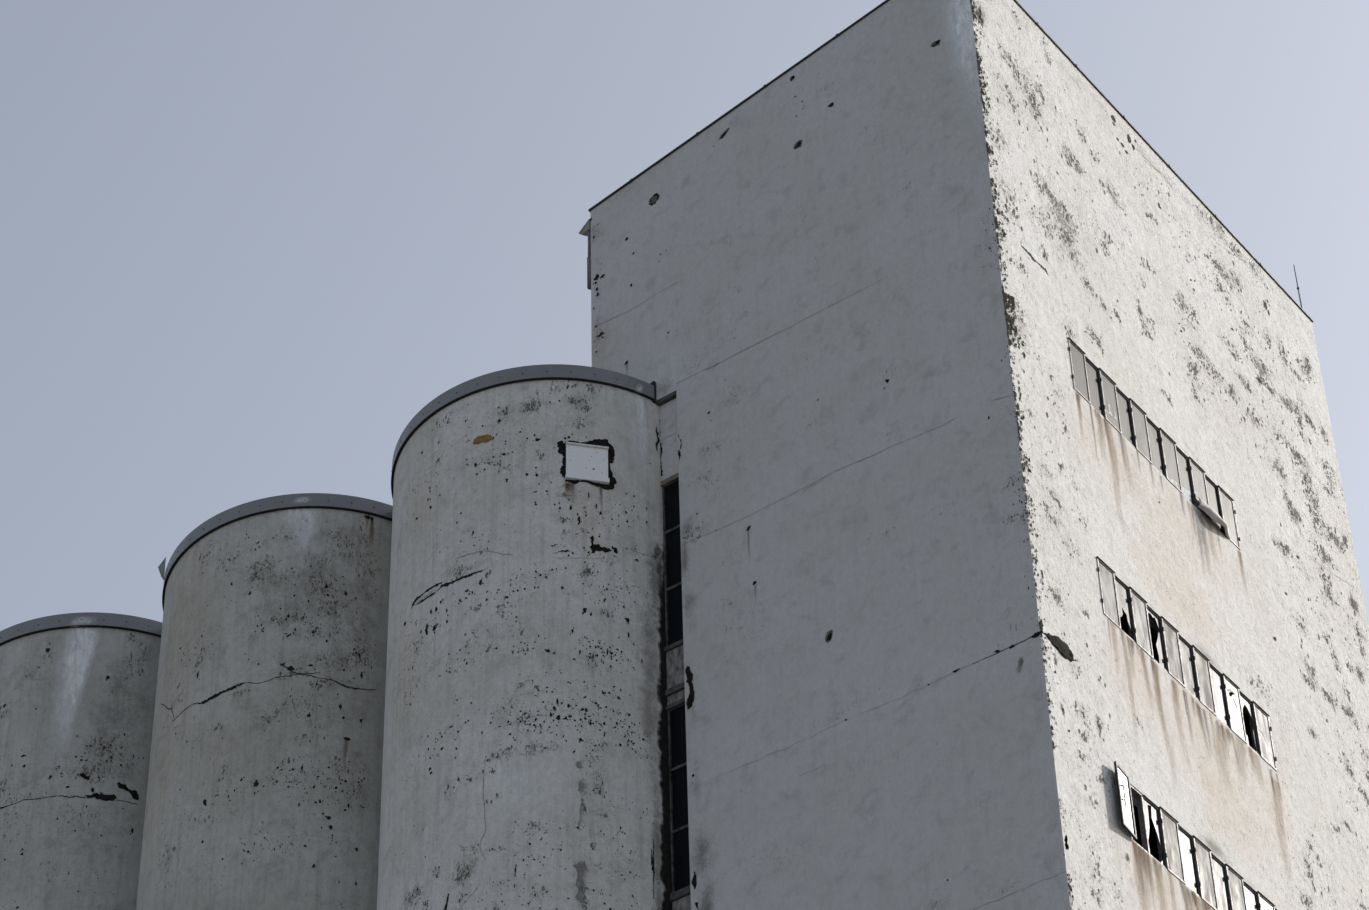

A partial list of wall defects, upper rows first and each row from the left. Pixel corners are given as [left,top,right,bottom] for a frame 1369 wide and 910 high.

crack [411,551,511,608]
crack [161,664,377,722]
spalling [178,568,377,886]
spalling [392,404,662,910]
spalling [1041,619,1076,689]
rust [1108,621,1254,755]
crack [0,795,86,809]
spalling [38,734,144,841]
rust [1133,841,1215,910]